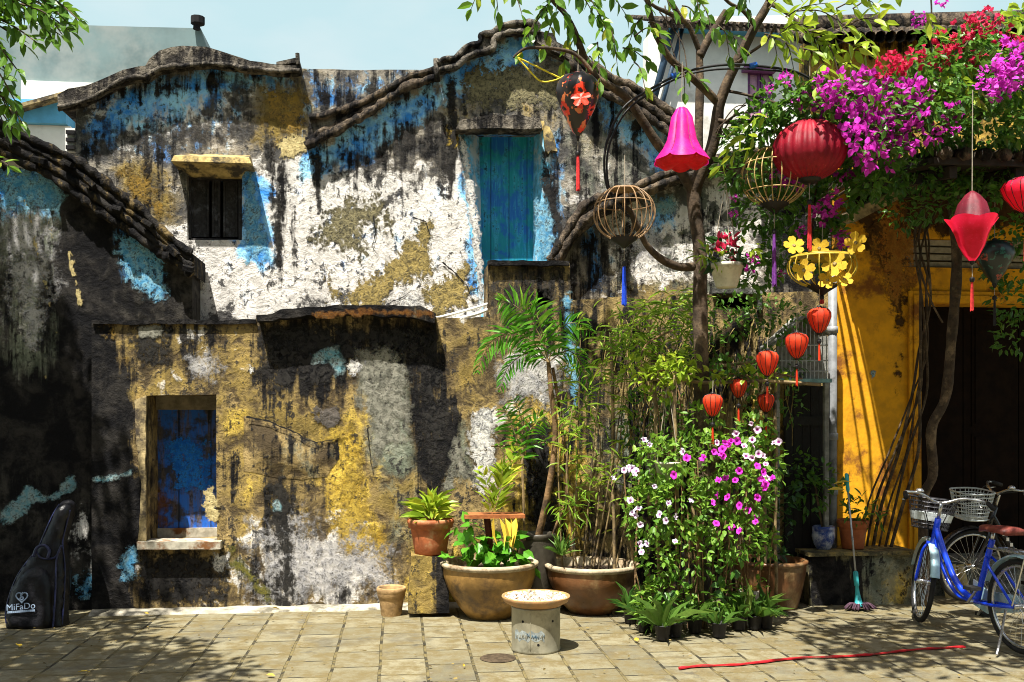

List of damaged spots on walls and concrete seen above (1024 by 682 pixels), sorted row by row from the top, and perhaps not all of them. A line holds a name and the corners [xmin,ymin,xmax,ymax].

water stain [74,74,284,281]
peeling [244,171,270,265]
spalling [306,128,484,316]
water stain [310,80,482,210]
water stain [256,316,452,480]